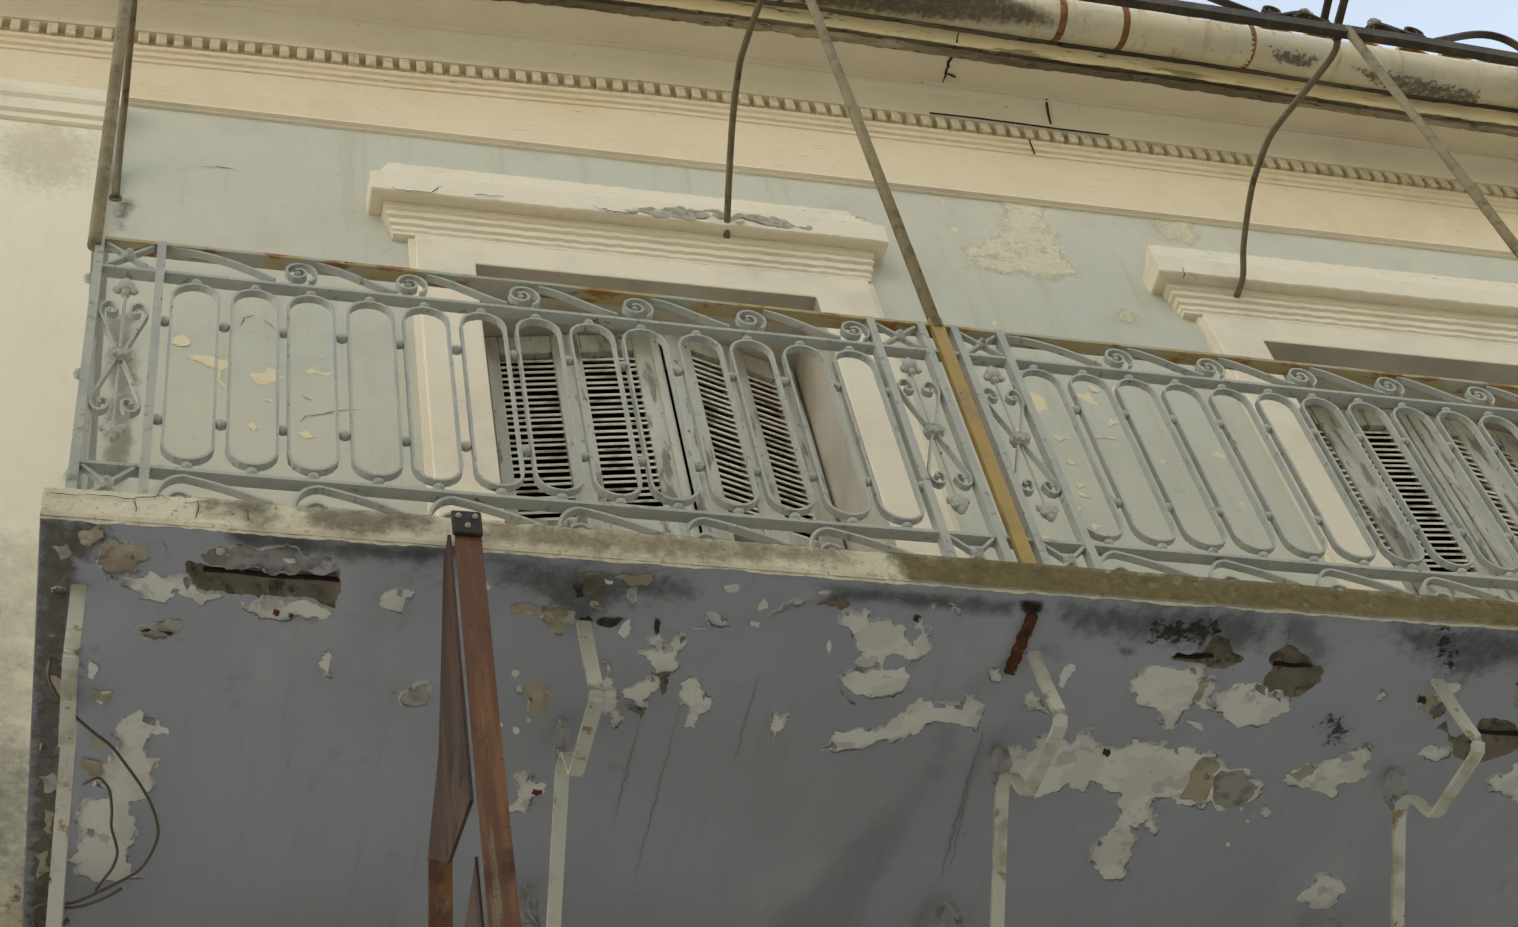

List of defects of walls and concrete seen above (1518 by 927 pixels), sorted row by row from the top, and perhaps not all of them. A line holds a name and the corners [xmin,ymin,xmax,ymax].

peeling [88,659,112,705]
spalling [51,525,341,642]
peeling [510,571,731,730]
peeling [750,589,987,754]
rust [1004,601,1043,676]
mould [1147,617,1222,648]
damp [1437,627,1459,668]
peeling [35,773,57,879]
peeling [66,708,170,882]
peeling [1007,635,1376,882]
spalling [1415,681,1518,804]